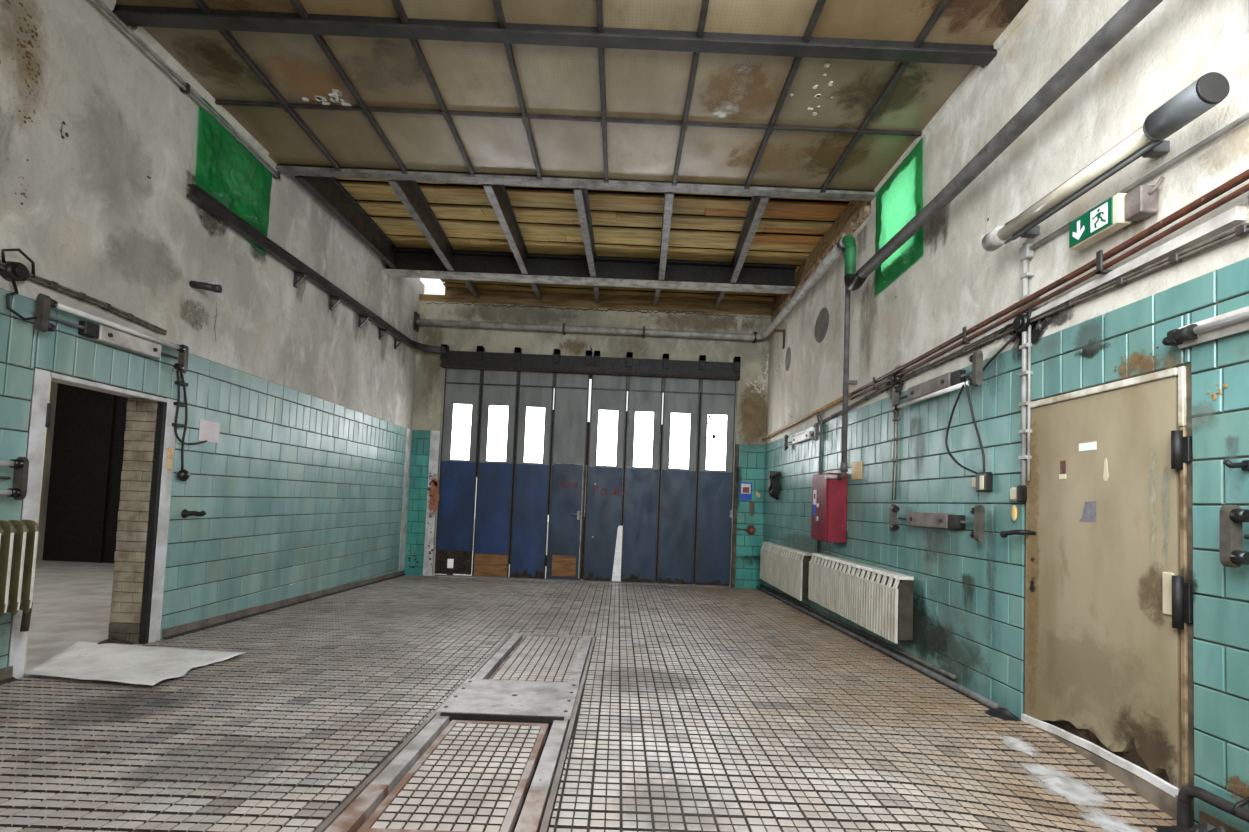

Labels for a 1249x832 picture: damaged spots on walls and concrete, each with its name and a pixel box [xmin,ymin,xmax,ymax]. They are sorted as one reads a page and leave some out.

leakage [933,0,1029,32]
rust [6,0,41,124]
leakage [1076,341,1108,358]
leakage [962,575,973,609]
leakage [909,591,979,681]